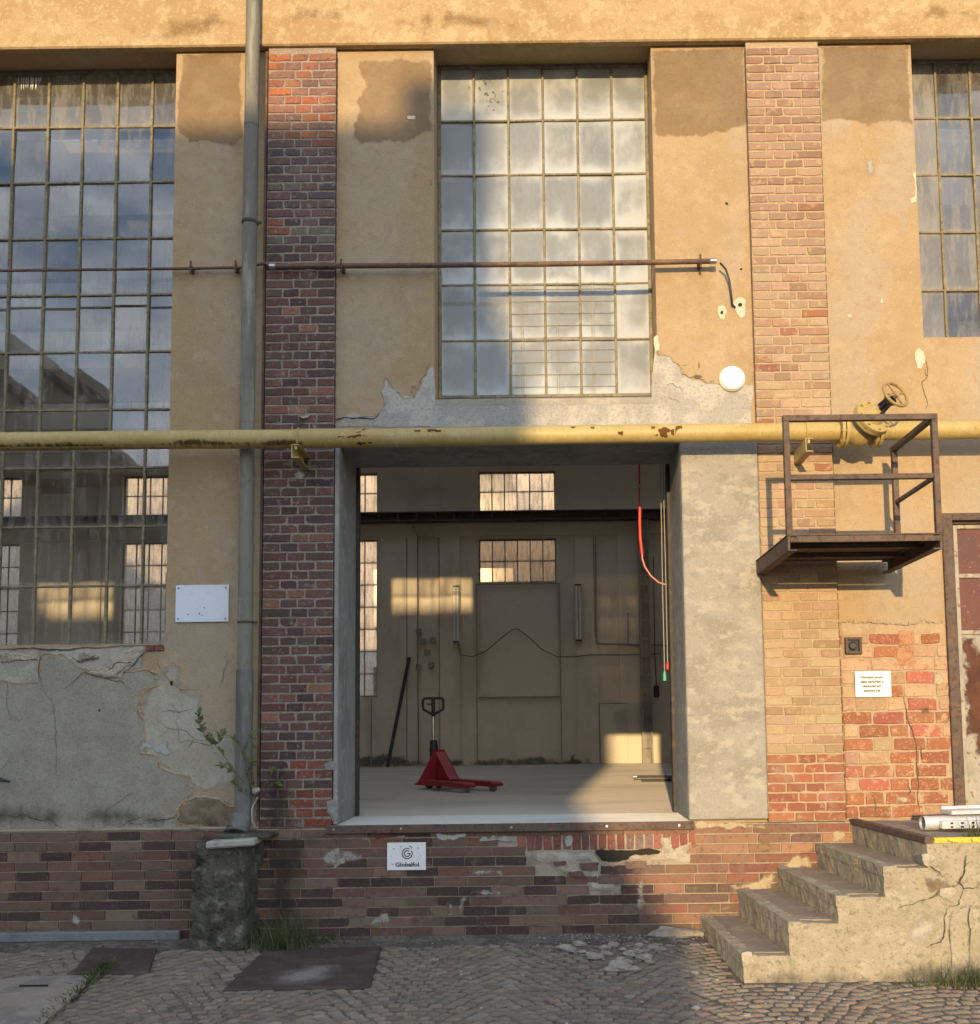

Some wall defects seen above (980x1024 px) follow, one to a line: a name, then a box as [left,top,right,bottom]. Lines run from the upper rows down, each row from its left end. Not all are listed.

peeling [651,335,753,438]
peeling [0,644,194,829]
crack [904,701,923,812]
rust [962,638,980,754]
spalling [480,830,695,891]
crack [899,855,975,966]